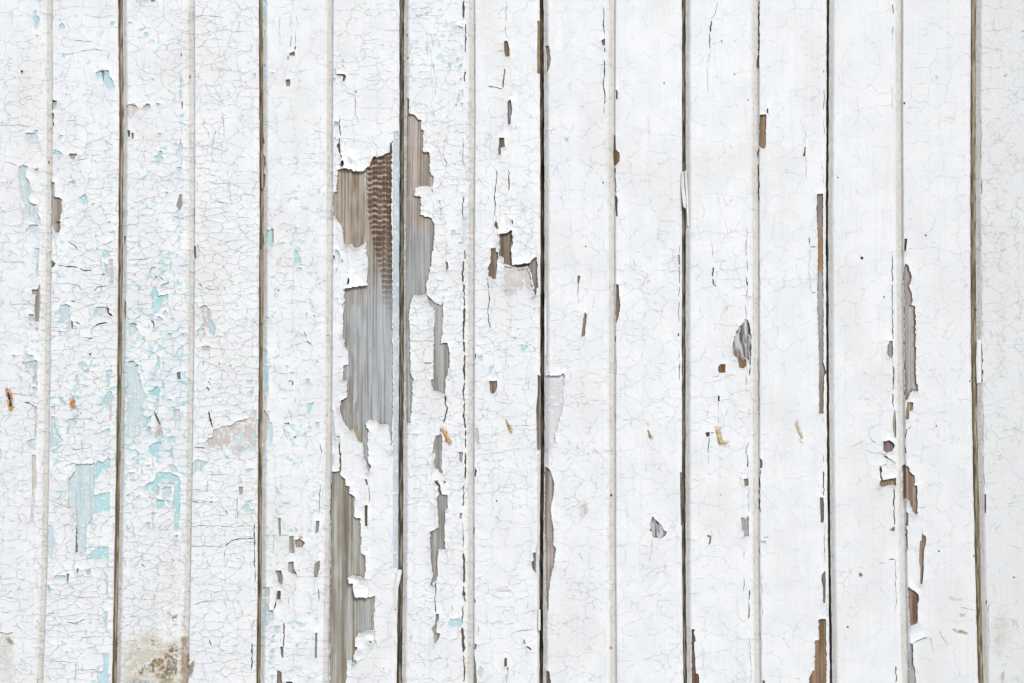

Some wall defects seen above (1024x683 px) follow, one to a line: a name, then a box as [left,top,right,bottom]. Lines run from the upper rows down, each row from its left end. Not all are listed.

crack [462,1,505,89]
crack [755,1,763,56]
crack [336,120,344,169]
crack [754,150,762,201]
peeling [262,7,462,683]
spalling [714,307,752,377]
peeling [808,193,826,414]
crack [460,250,468,681]
peeling [487,170,567,683]
crack [746,445,761,512]
peeling [852,264,927,683]
peeling [809,619,827,683]